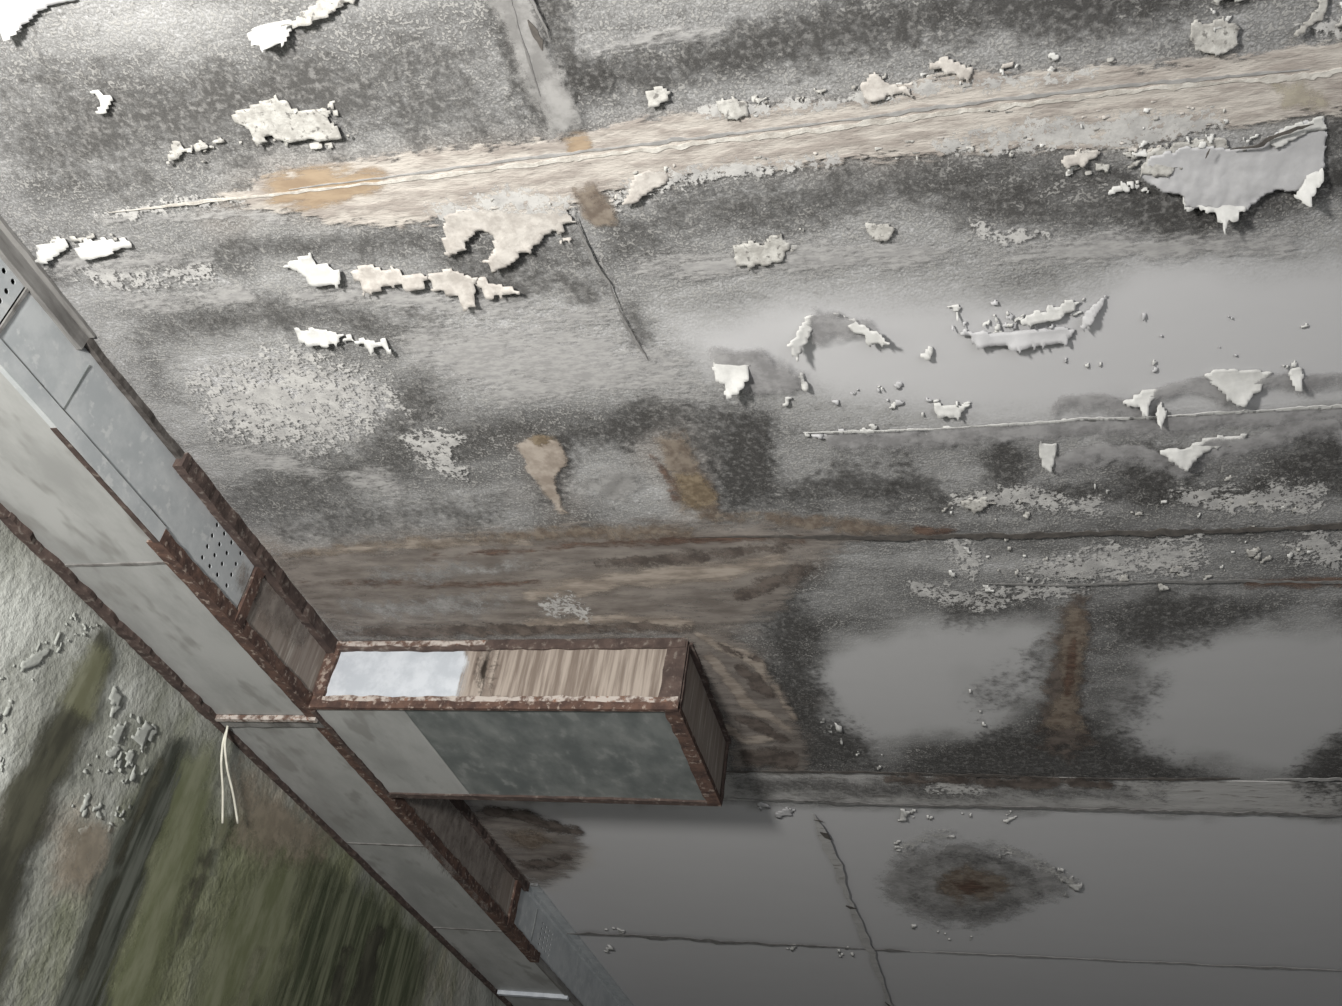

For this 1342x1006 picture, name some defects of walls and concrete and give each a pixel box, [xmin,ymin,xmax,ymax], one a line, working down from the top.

peeling [0,0,75,41]
damp [1,36,500,224]
rust [269,166,384,210]
spalling [166,0,1342,311]
damp [619,154,1297,280]
damp [1314,117,1342,198]
peeling [294,327,391,355]
peeling [947,295,1107,363]
peeling [803,354,1342,511]
damp [50,230,1342,803]
rust [1033,589,1097,762]
damp [881,829,1077,929]